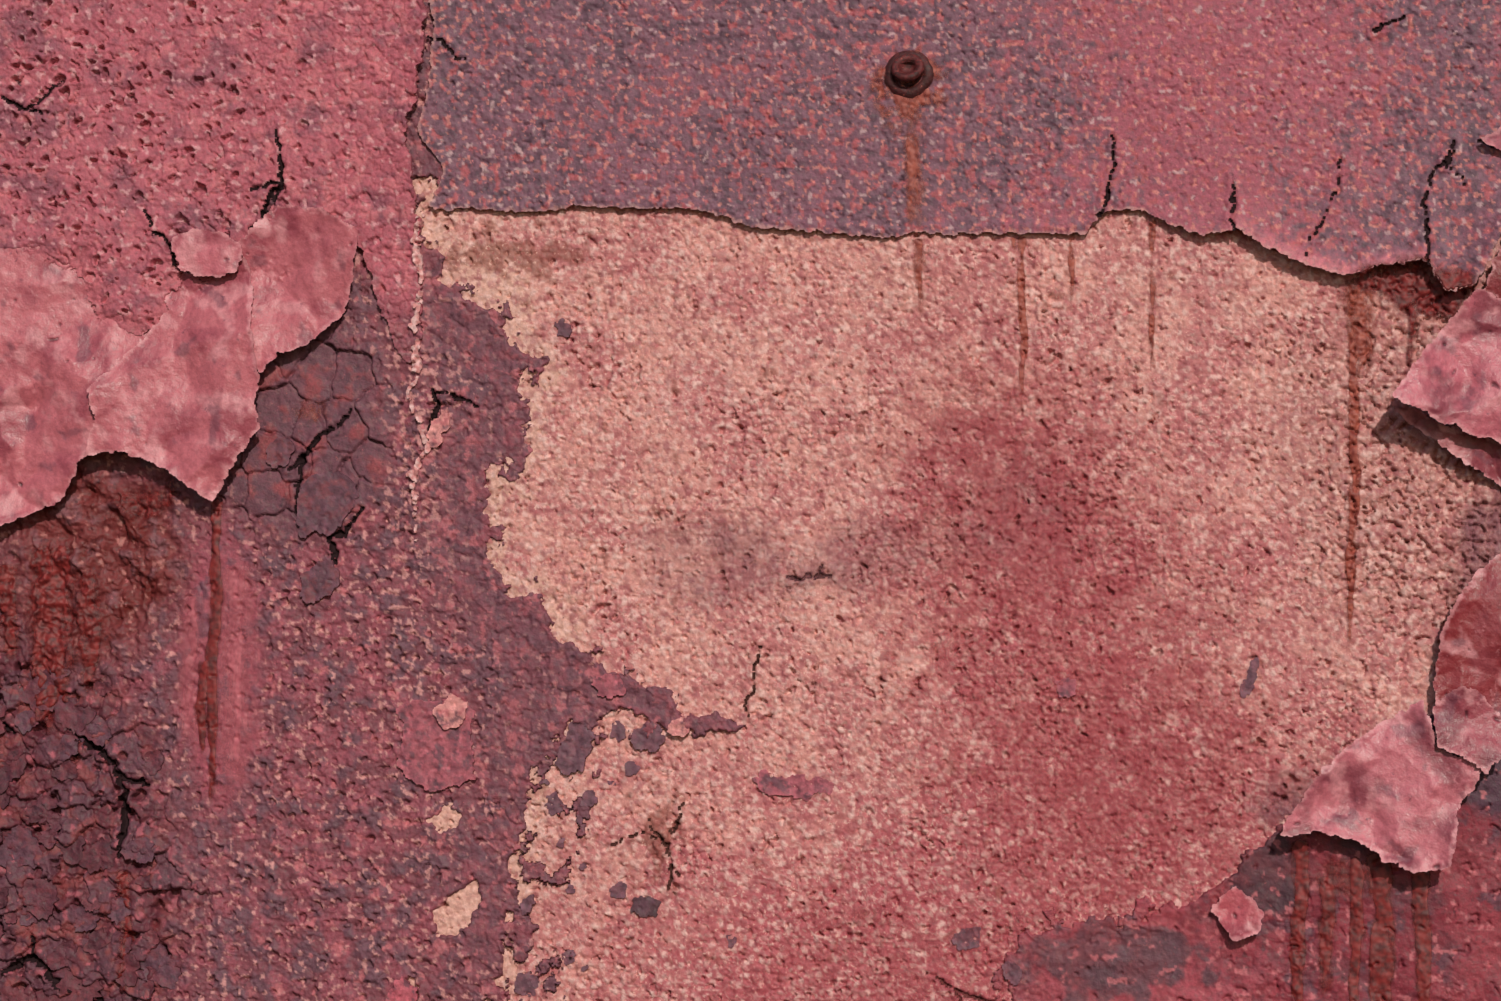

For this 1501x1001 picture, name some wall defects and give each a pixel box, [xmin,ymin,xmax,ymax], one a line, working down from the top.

corrosion [871,50,948,221]
crack [1097,134,1117,217]
crack [1228,184,1236,231]
crack [1305,158,1342,256]
peeling [1481,127,1501,150]
corrosion [913,239,926,300]
peeling [0,204,359,526]
crack [287,408,352,516]
crack [327,506,365,564]
spalling [412,176,1501,1001]
peeling [396,693,476,834]
corrosion [1289,840,1432,1001]